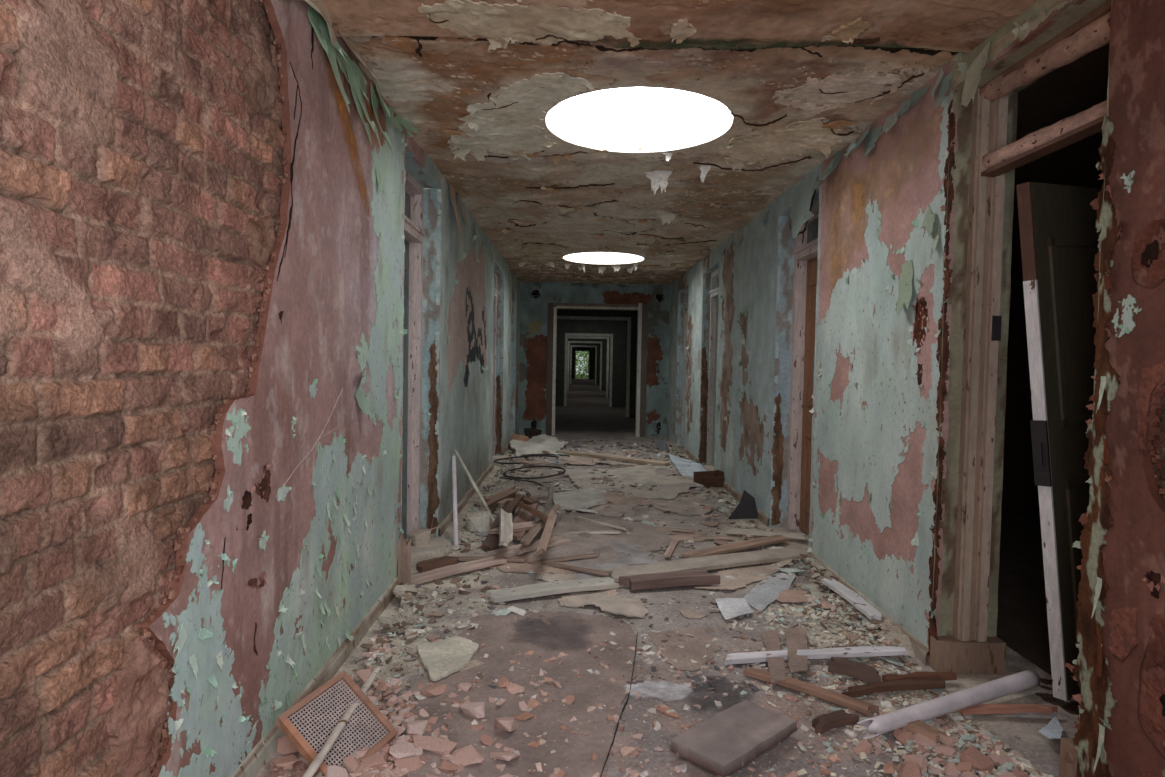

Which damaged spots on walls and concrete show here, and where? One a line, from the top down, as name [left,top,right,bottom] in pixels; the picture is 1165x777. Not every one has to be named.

crack [372,36,671,57]
crack [701,46,756,54]
crack [791,45,960,57]
crack [277,24,314,281]
peeling [440,72,608,165]
peeling [644,153,673,194]
crack [790,176,819,243]
flaking render [0,0,421,777]
peeling [426,181,503,534]
peeling [539,185,784,526]
peeling [693,0,1073,656]
flaking render [1105,219,1165,338]